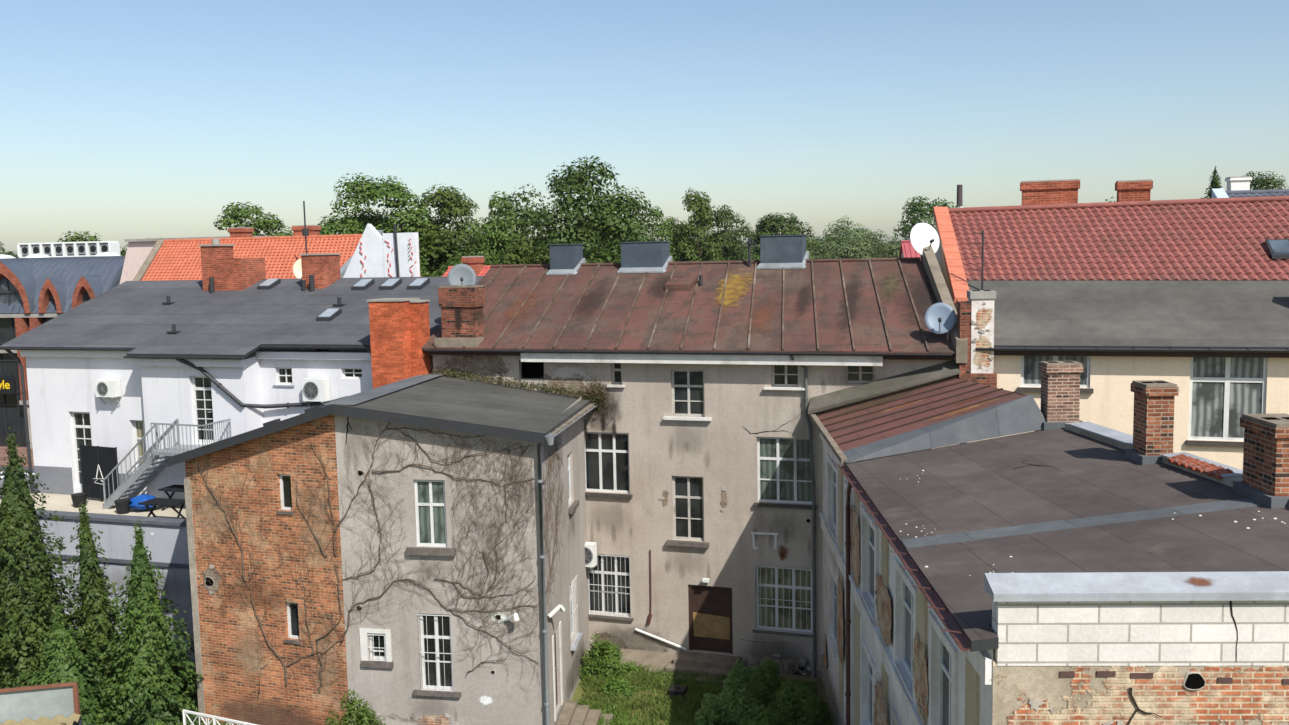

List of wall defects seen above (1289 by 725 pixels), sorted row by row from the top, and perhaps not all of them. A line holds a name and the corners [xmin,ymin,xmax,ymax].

peeling [971,302,994,369]
peeling [822,505,860,682]
peeling [875,574,892,646]
corrosion [1188,578,1211,586]
crack [1230,601,1238,662]
spalling [375,712,458,725]